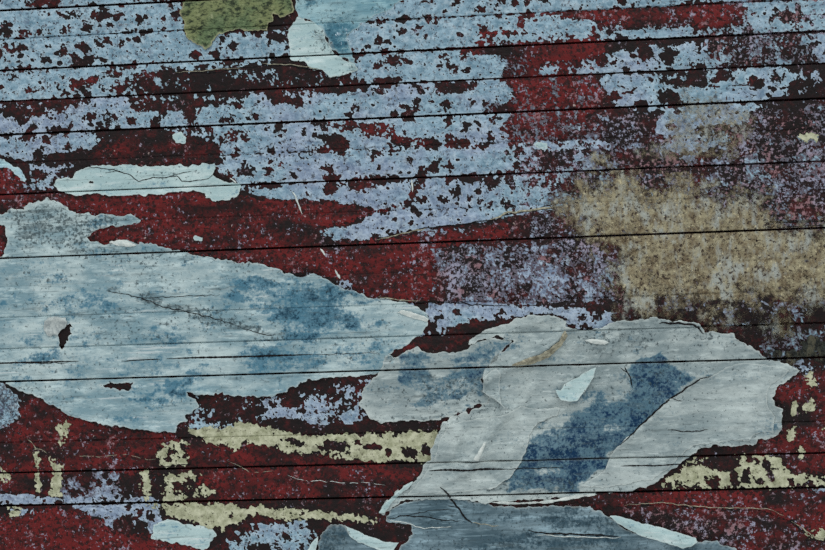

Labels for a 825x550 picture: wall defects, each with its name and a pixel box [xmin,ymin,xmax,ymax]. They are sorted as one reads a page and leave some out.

peeling [0,0,825,337]
crack [110,291,371,361]
peeling [712,279,825,387]
peeling [791,397,816,416]
peeling [0,379,438,550]
peeling [661,453,825,493]
peeling [786,426,806,459]